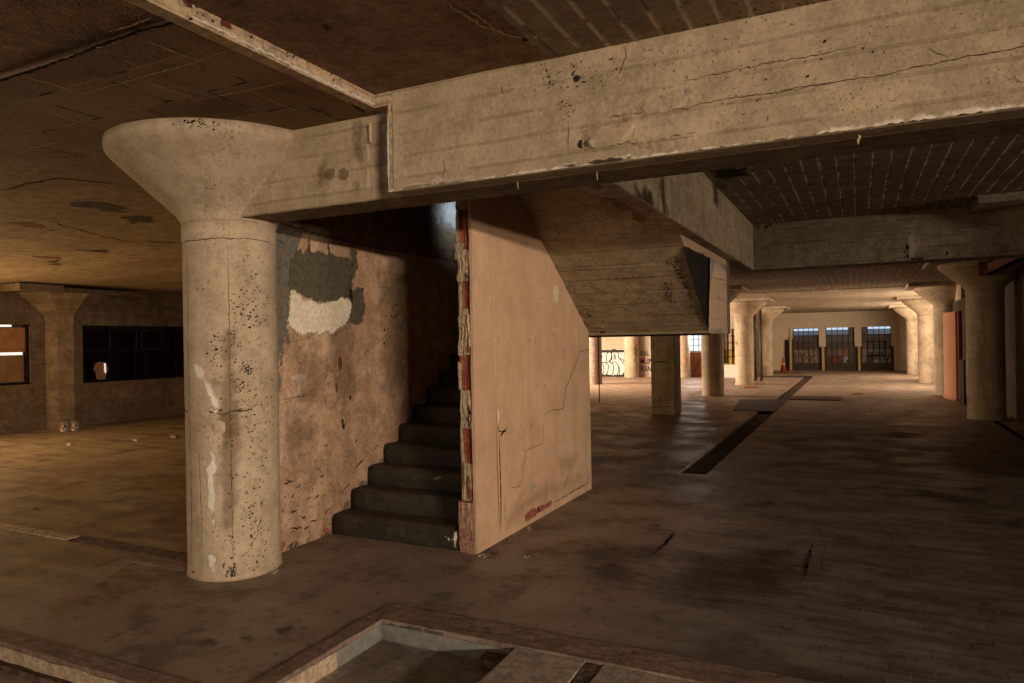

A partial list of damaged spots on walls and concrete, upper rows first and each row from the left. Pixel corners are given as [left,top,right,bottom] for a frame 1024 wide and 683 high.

crack [5,178,173,282]
flaking render [200,242,384,575]
spalling [448,200,474,554]
crack [684,44,1024,105]